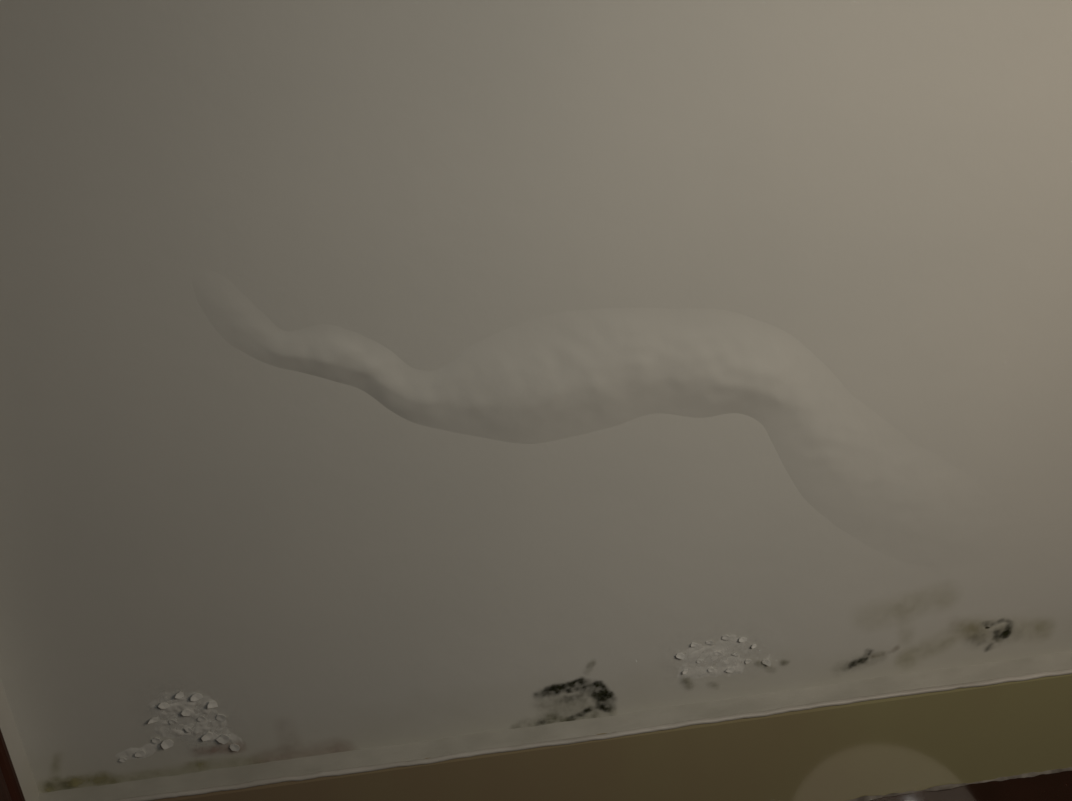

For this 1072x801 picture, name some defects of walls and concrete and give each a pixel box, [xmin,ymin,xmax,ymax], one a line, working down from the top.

water stain [545,678,613,721]